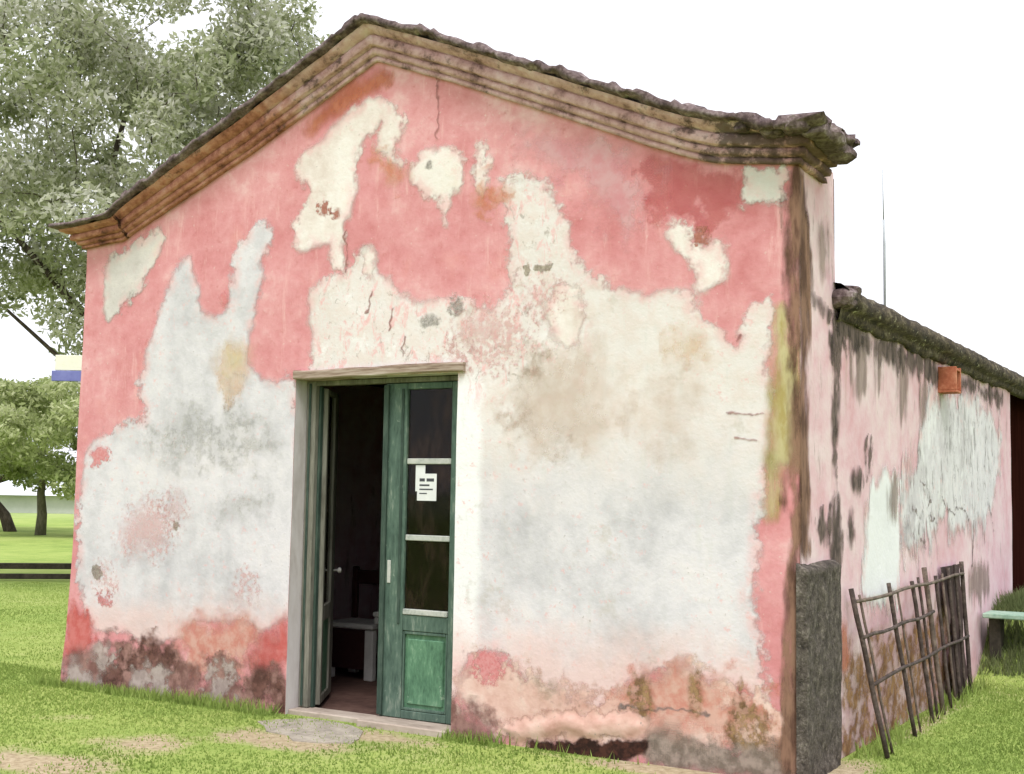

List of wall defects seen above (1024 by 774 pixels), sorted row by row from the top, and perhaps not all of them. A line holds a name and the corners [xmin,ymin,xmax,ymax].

flaking render [63,220,296,694]
flaking render [292,97,784,760]
leakage [645,166,854,774]
leakage [852,433,872,491]
leakage [829,311,951,477]
flaking render [899,385,1002,568]
leakage [960,376,1003,408]
leakage [969,564,990,607]
leakage [61,626,286,714]
leakage [451,697,497,742]
leakage [627,678,652,717]